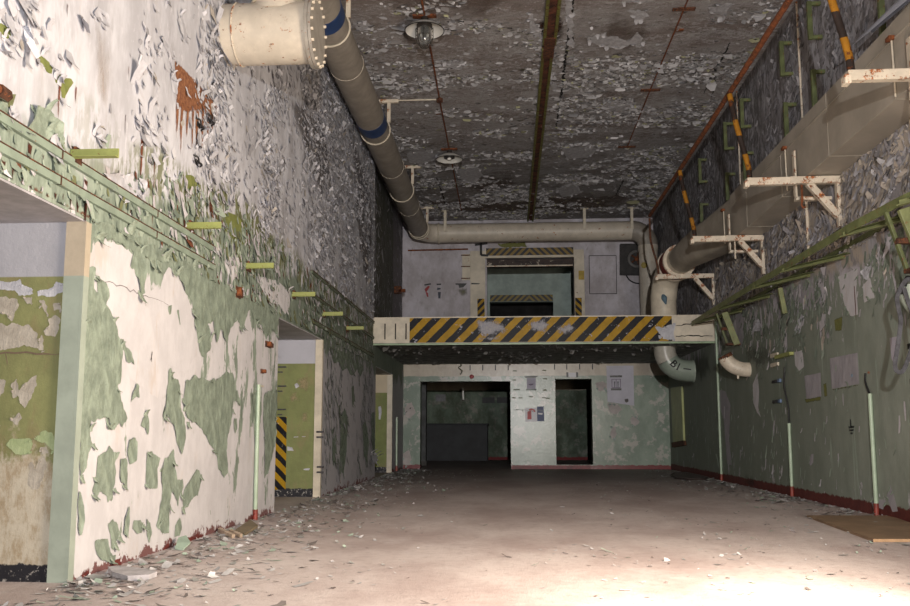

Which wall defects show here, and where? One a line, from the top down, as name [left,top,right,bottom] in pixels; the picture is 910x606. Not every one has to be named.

corrosion [175,62,218,144]
peeling [0,0,403,570]
peeling [351,0,890,254]
peeling [382,123,910,489]